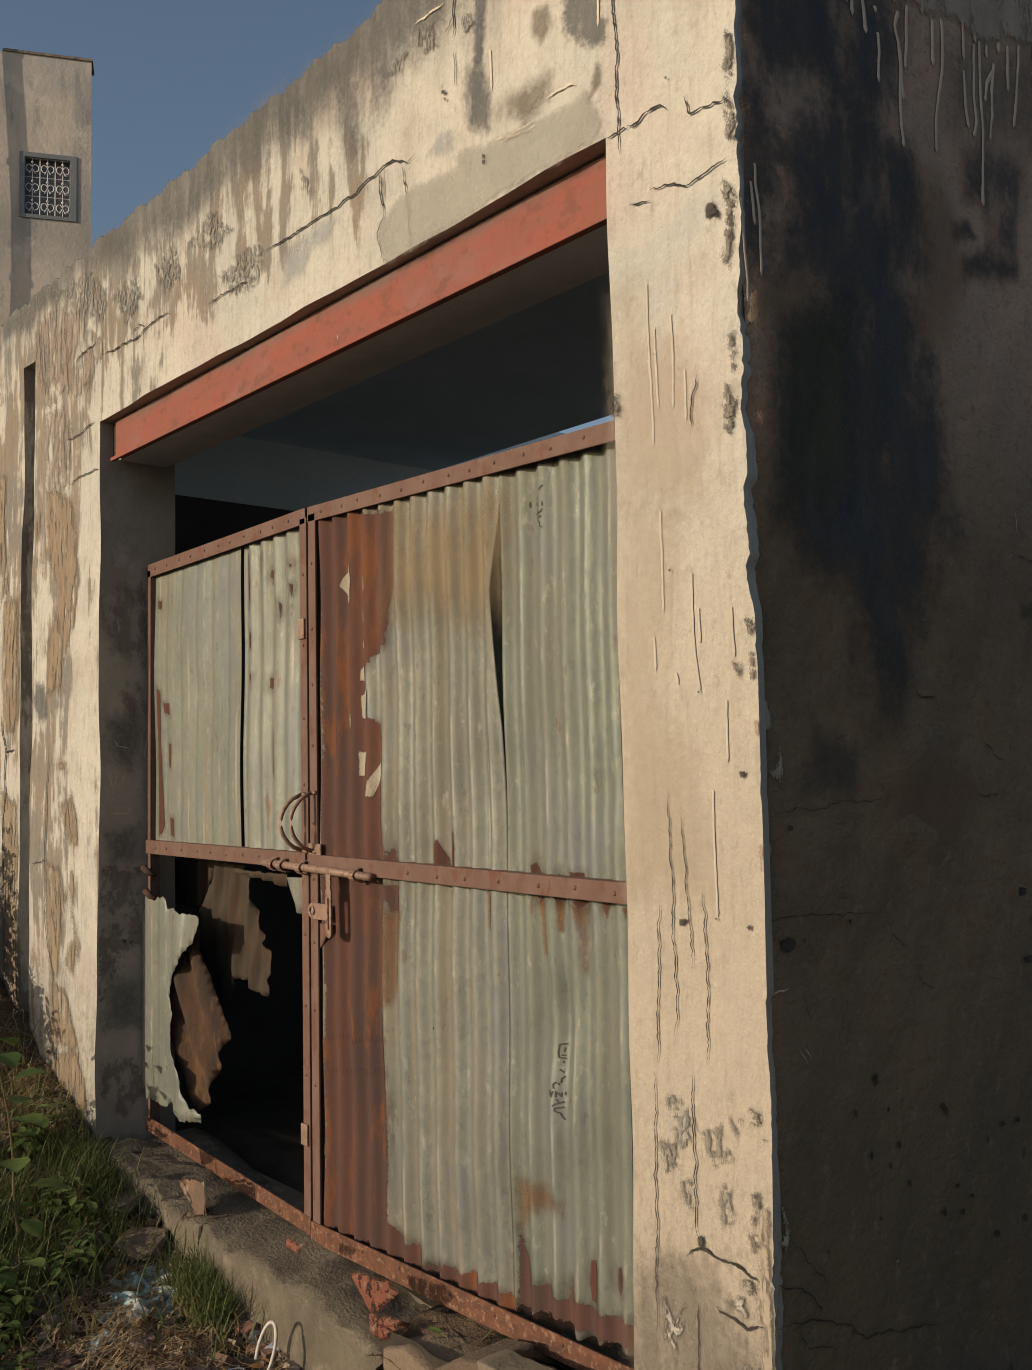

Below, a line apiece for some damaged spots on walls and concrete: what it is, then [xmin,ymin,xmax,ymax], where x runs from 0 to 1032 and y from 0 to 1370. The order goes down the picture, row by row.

crack [263,157,412,261]
leakage [468,0,493,128]
crack [630,160,723,205]
leakage [740,0,944,673]
leakage [961,20,1032,205]
peeling [0,476,19,733]
peeling [35,271,147,697]
rust [318,510,398,860]
rust [433,832,454,866]
peeling [45,863,144,1117]
rust [320,874,634,1352]
crack [653,790,942,1370]